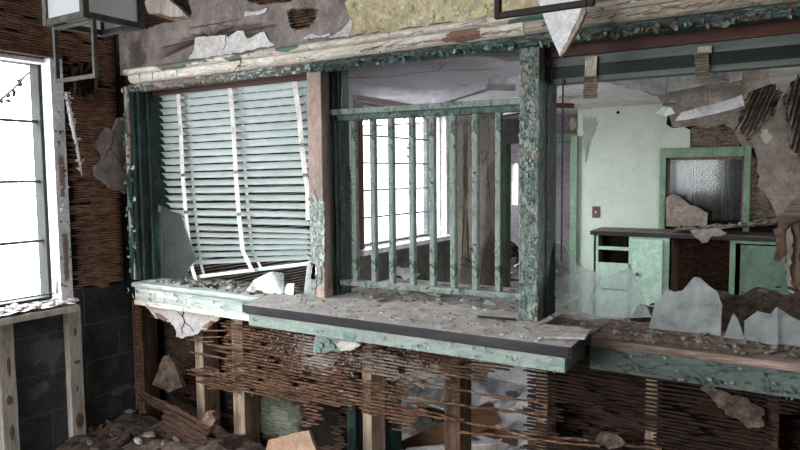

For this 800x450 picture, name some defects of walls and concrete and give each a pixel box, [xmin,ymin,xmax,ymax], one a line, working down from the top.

flaking render [244,0,353,40]
flaking render [120,31,553,312]
flaking render [666,96,800,226]
peeling [289,319,362,353]